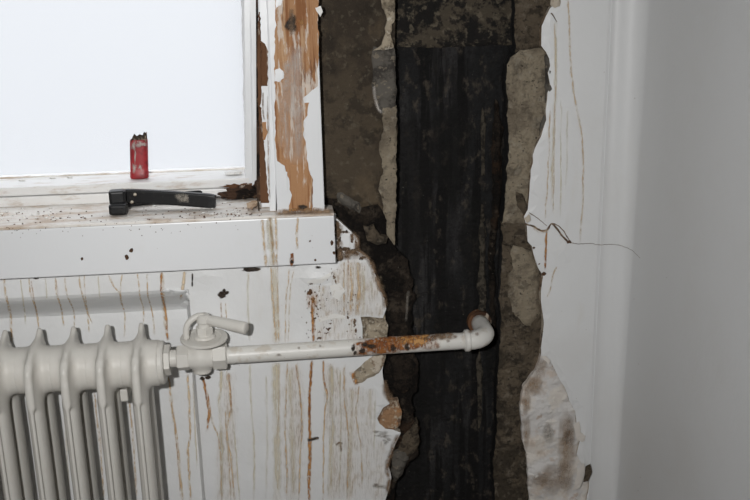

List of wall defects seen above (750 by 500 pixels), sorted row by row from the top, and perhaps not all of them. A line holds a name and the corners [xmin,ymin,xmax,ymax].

rust [202,380,221,459]
spalling [257,0,416,339]
spalling [351,352,420,500]
spalling [489,0,592,500]